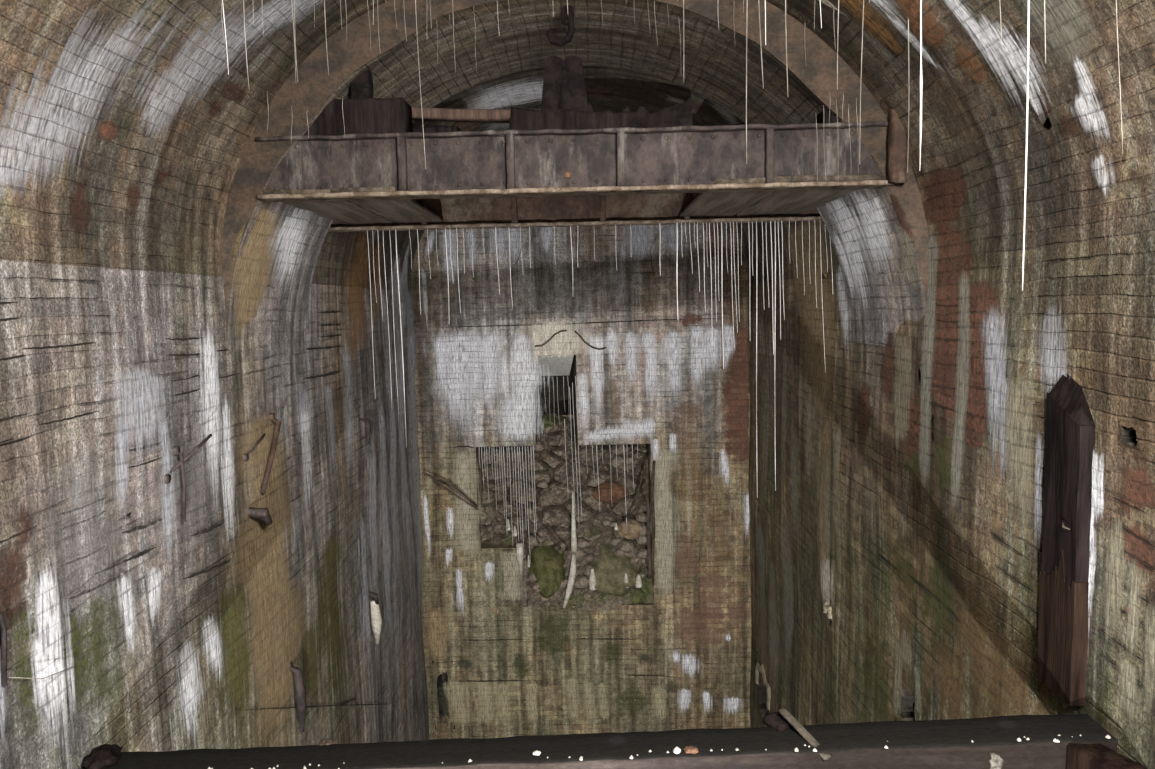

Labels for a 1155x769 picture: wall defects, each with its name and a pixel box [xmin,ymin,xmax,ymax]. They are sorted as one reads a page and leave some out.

water stain [1021,0,1107,135]
water stain [1093,156,1108,194]
water stain [1041,311,1066,390]
water stain [434,321,734,460]
peeling [503,552,520,601]
water stain [1088,456,1155,713]
water stain [673,652,699,677]
water stain [669,684,738,712]